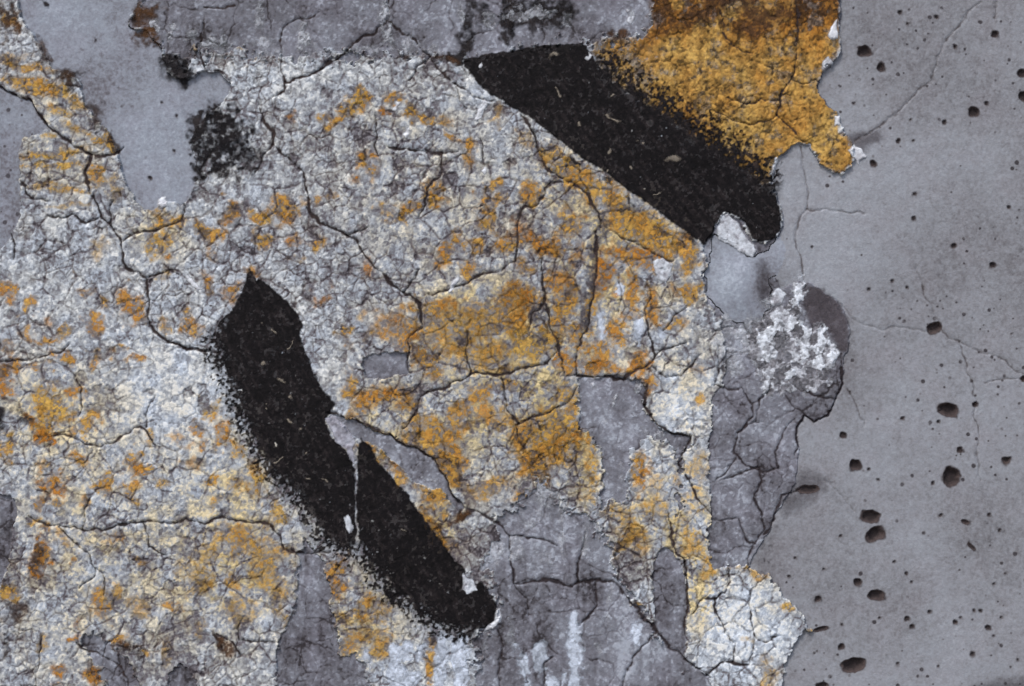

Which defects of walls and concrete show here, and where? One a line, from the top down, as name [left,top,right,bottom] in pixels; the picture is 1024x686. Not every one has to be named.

crack [199,5,236,75]
peeling [829,20,838,39]
peeling [19,0,655,210]
peeling [849,145,866,164]
crack [0,85,216,353]
peeling [717,213,757,257]
crack [255,0,844,686]
crack [56,379,156,447]
peeling [707,281,850,570]
crack [28,497,331,595]
peeling [462,374,711,686]
crack [216,622,268,656]